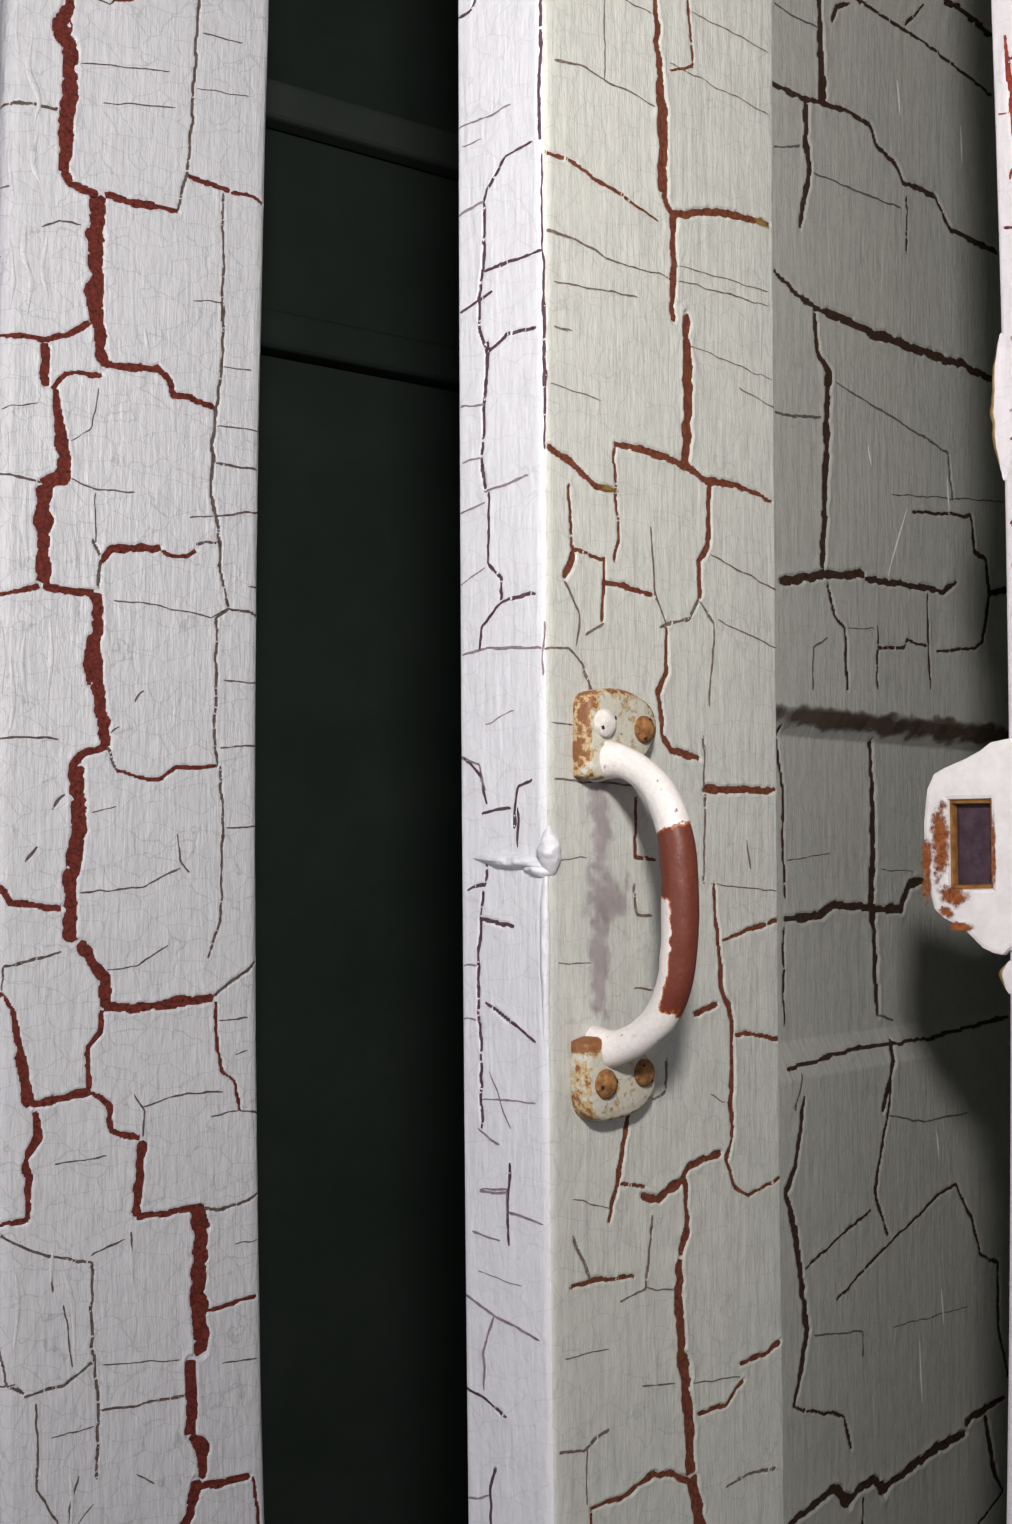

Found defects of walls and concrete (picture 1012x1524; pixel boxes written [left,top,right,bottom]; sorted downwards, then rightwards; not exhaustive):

crack [0,0,263,1524]
crack [459,0,1012,1524]
rust [921,801,972,932]